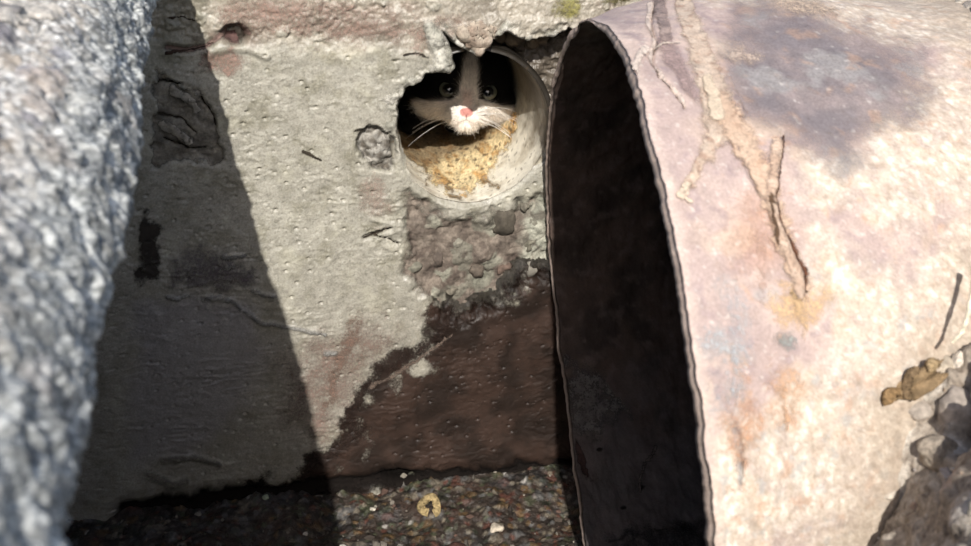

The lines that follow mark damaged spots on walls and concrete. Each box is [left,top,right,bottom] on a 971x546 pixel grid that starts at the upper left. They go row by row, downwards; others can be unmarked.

peeling [150,69,224,168]
spalling [357,20,558,169]
crack [631,0,699,109]
spalling [403,191,549,304]
leakage [242,265,572,494]